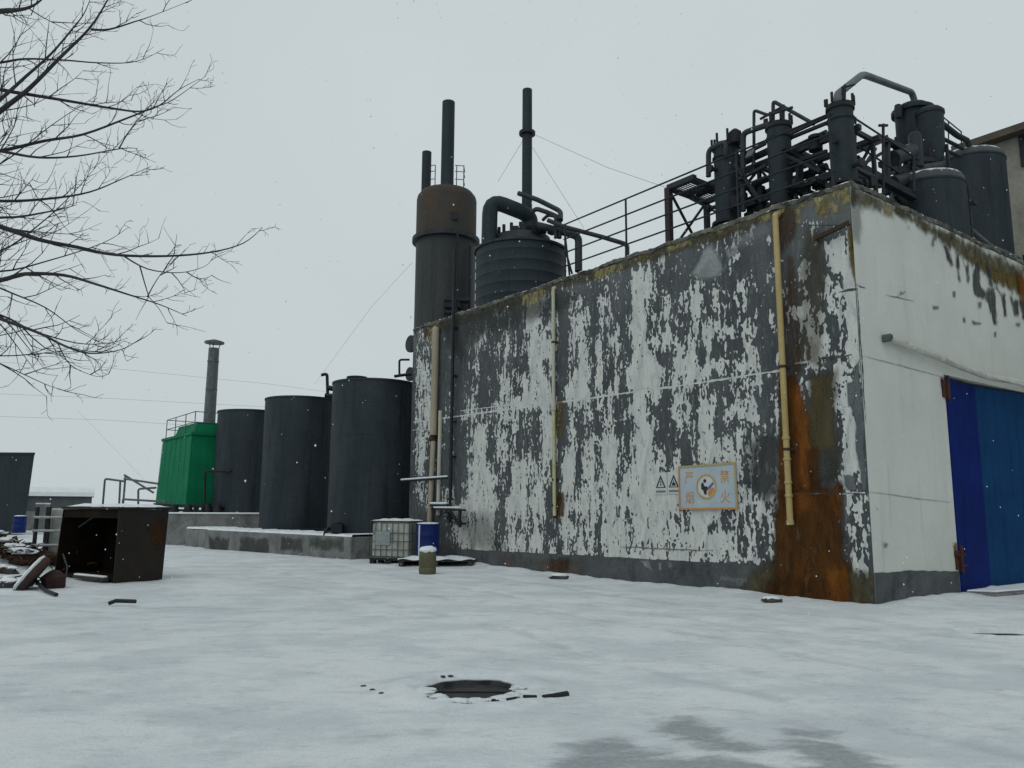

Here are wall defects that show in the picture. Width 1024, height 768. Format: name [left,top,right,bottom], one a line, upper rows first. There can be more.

damp [850,186,1024,324]
peeling [413,220,870,575]
corrosion [743,375,874,604]